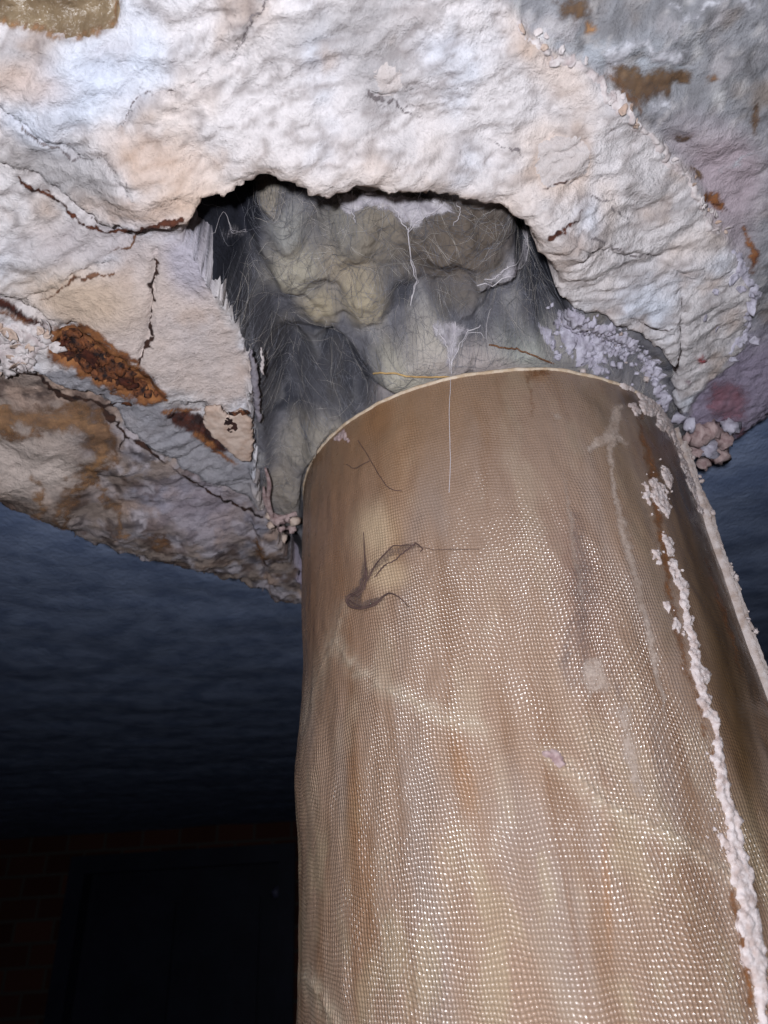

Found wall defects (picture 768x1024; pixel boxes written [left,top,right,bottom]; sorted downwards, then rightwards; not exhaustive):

crack [18,176,184,297]
crack [139,258,159,365]
corrosion [0,299,235,463]
crack [18,372,263,518]
flaking render [203,404,255,462]